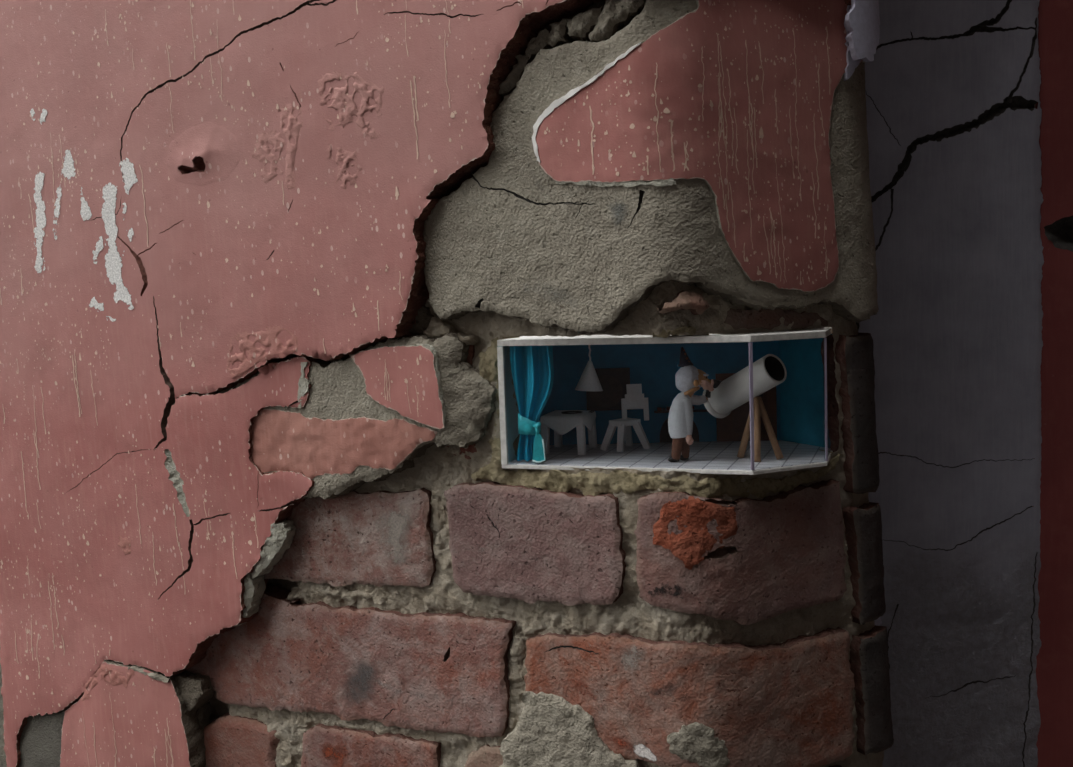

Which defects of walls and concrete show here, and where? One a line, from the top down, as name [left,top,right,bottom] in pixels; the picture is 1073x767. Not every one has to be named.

crack [67,0,336,599]
flaking render [218,0,879,500]
crack [865,0,1037,251]
flaking render [234,520,296,627]
spalling [653,496,738,570]